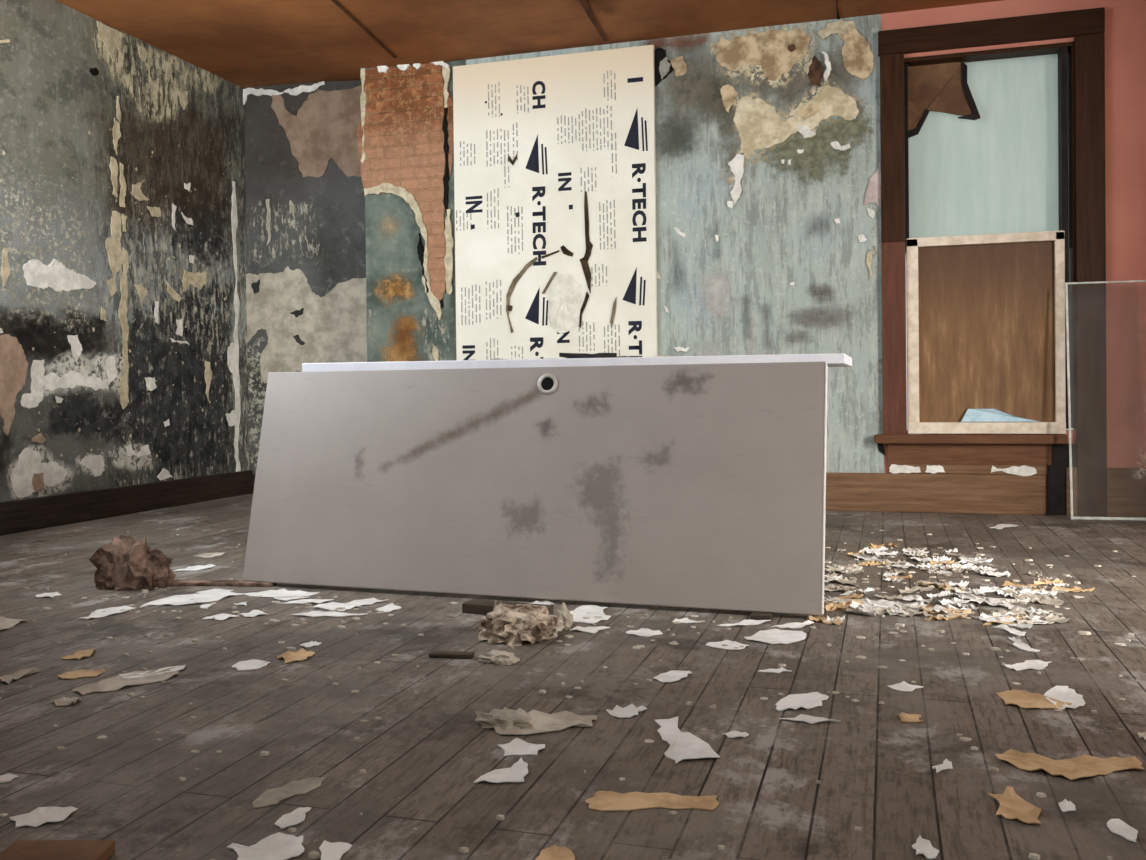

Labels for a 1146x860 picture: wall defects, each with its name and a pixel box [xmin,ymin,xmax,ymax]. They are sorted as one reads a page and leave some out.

spalling [710,20,874,208]
spalling [0,18,372,472]
spalling [243,61,455,361]
damp [10,320,103,361]
damp [187,290,211,381]
damp [50,394,122,440]
peeling [7,433,172,500]